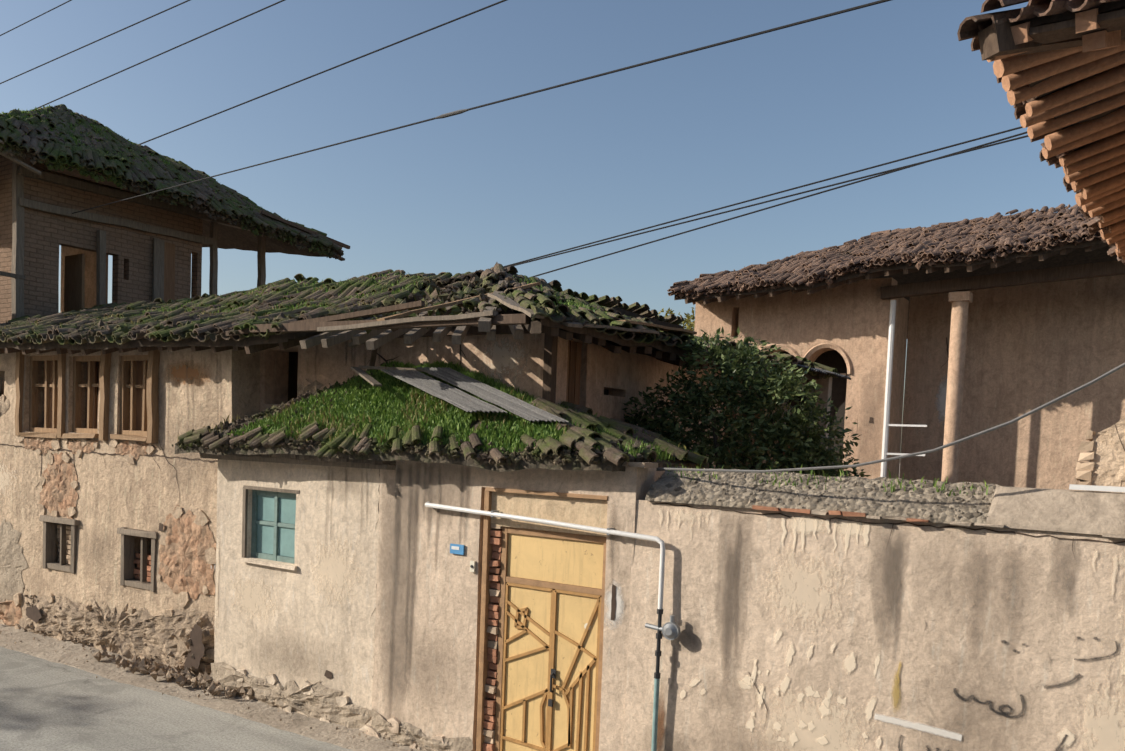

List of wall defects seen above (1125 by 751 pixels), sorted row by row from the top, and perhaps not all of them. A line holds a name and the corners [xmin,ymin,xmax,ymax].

spalling [0,504,473,751]
peeling [680,678,706,699]
spalling [738,630,889,751]